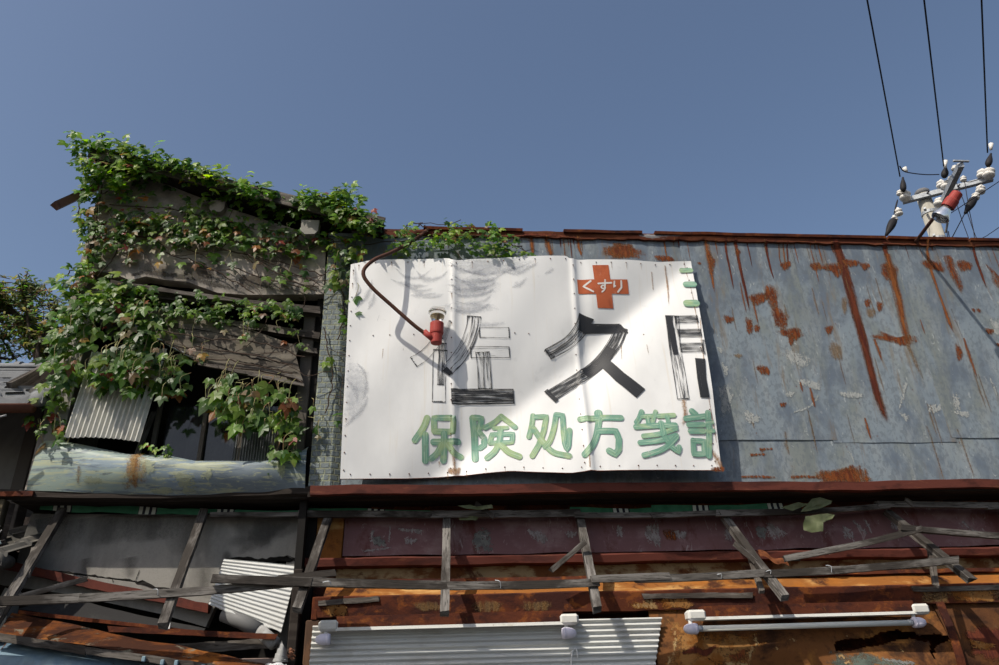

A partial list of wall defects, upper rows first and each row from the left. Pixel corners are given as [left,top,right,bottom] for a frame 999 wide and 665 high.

corrosion [604,243,641,266]
corrosion [651,236,925,419]
corrosion [905,239,999,407]
corrosion [124,453,144,488]
corrosion [791,465,869,482]